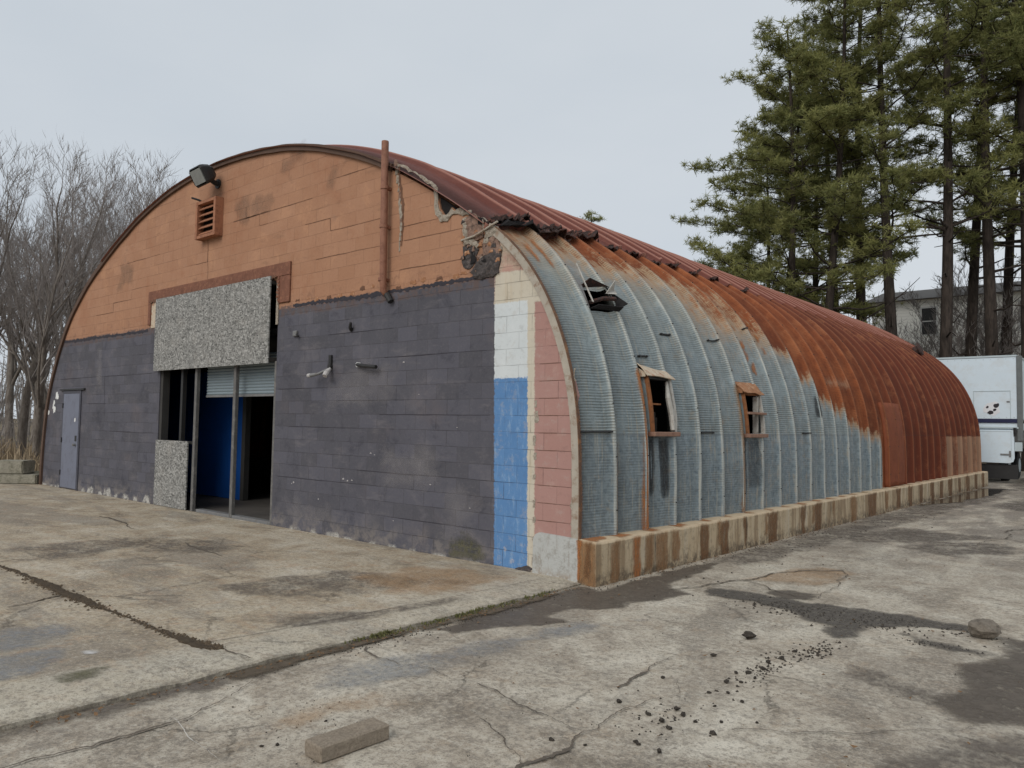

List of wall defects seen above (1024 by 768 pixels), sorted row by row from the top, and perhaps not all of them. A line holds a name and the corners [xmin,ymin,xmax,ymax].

crack [234,199,380,260]
spalling [293,159,639,308]
peeling [652,260,719,282]
rust [577,370,685,587]
rust [701,519,729,560]
rust [766,473,984,542]
crack [0,565,537,658]